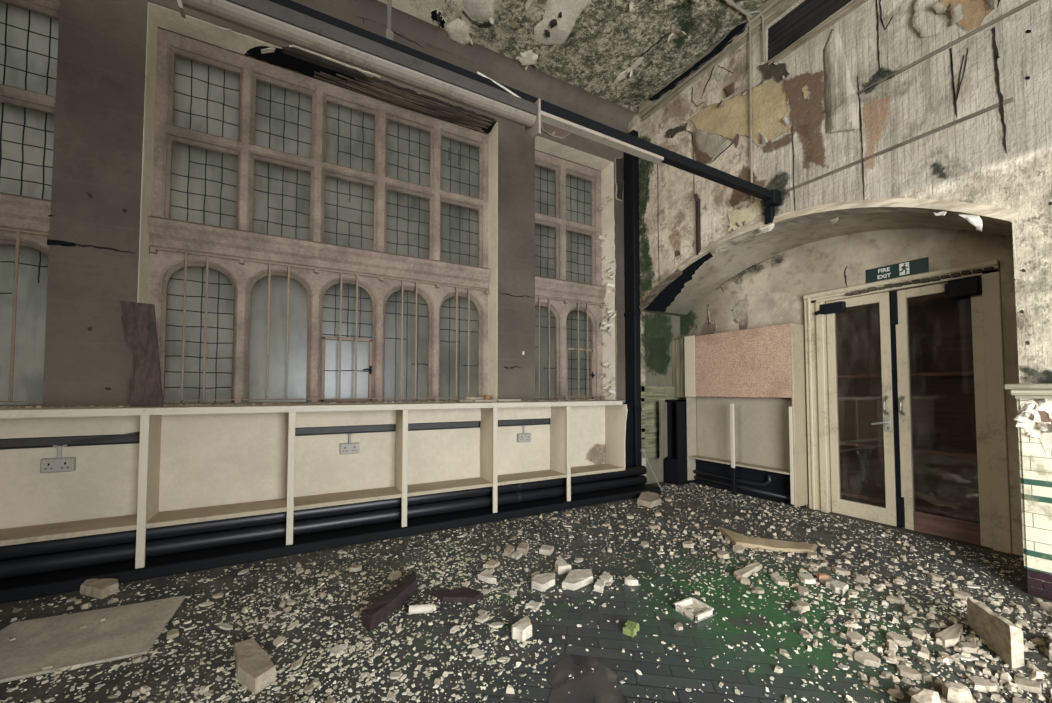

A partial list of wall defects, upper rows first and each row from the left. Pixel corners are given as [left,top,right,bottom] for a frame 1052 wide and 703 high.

spalling [545,12,562,37]
water stain [671,0,693,49]
peeling [945,2,964,27]
peeling [612,57,644,85]
water stain [639,158,697,375]
peeling [598,219,617,400]
peeling [1013,399,1052,453]